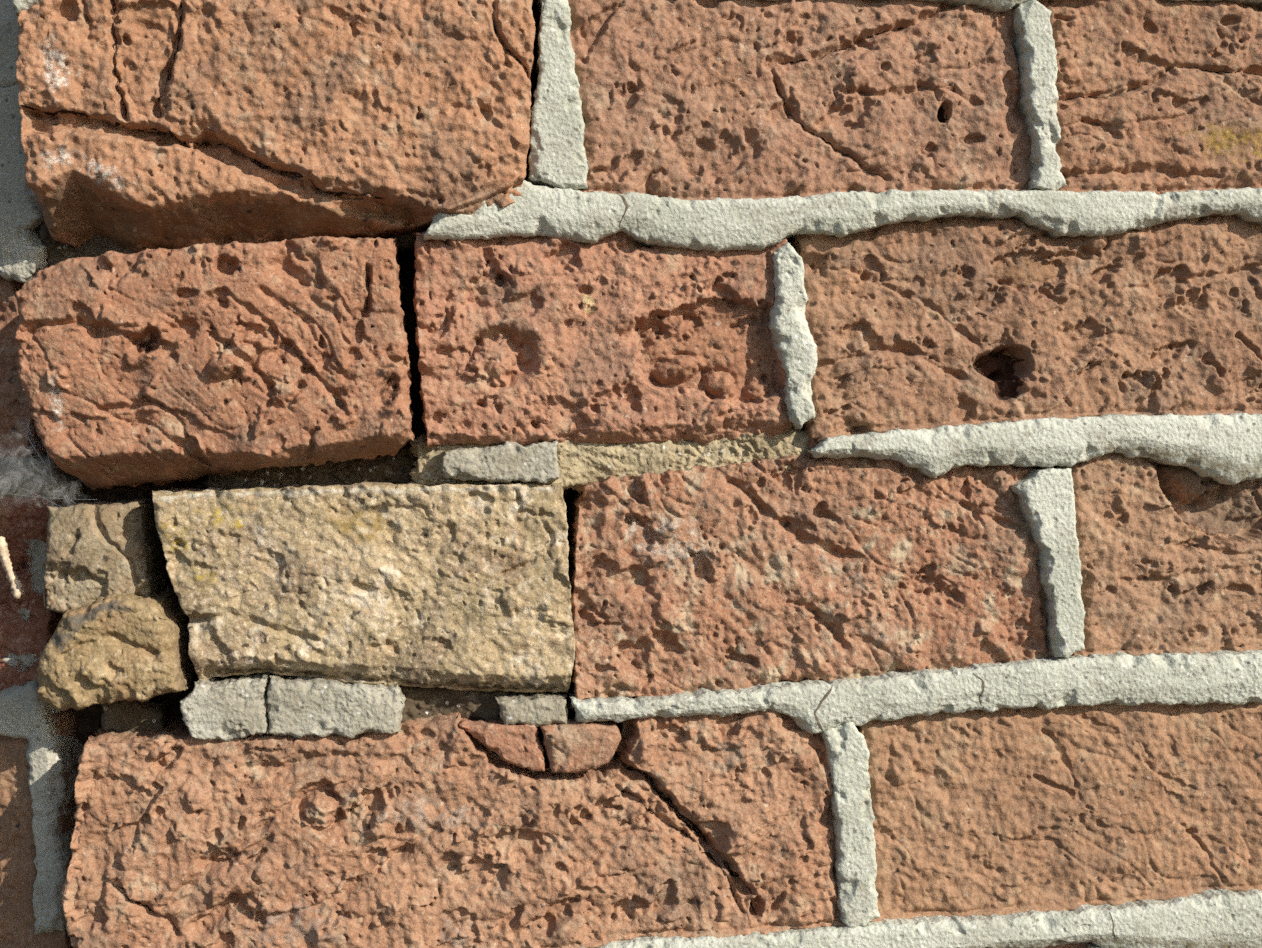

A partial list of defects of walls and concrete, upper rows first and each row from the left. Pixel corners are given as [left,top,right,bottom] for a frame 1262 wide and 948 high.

crack [493,6,528,74]
crack [21,0,386,200]
crack [67,478,208,504]
crack [162,548,174,590]
crack [68,704,104,744]
crack [154,677,225,718]
crack [466,709,574,770]
crack [614,722,757,915]